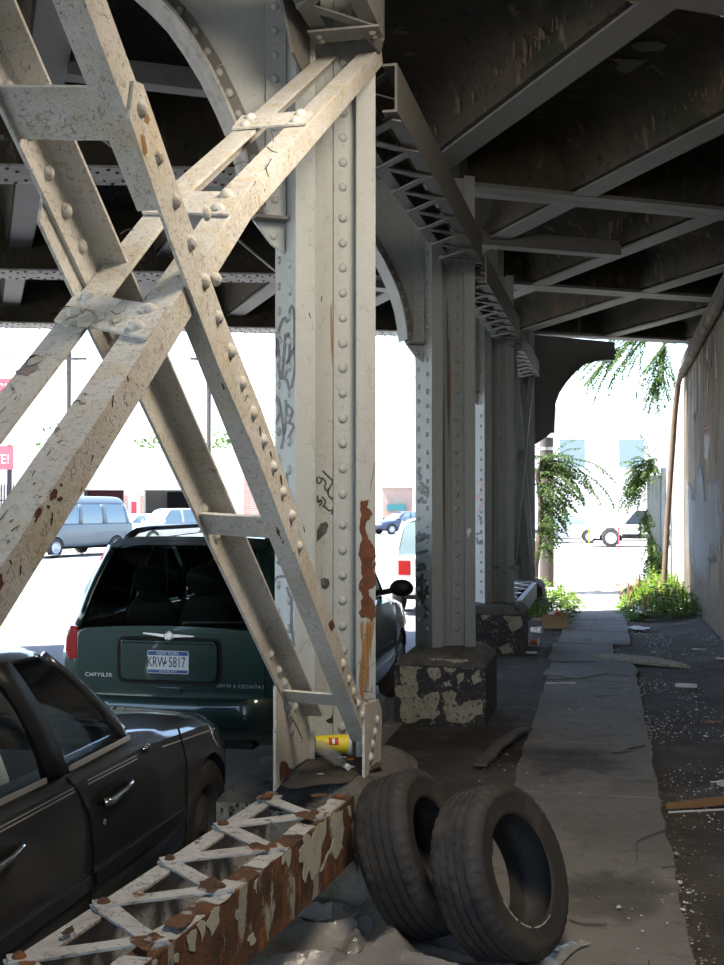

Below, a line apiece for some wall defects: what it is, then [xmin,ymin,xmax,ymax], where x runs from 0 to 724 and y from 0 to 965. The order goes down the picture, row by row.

rust [354,500,376,704]
peeling [498,616,522,654]
peeling [395,658,483,724]
rust [248,842,270,852]
peeling [281,806,351,885]
rust [197,876,221,893]
rust [130,904,198,952]
peeling [173,906,220,963]